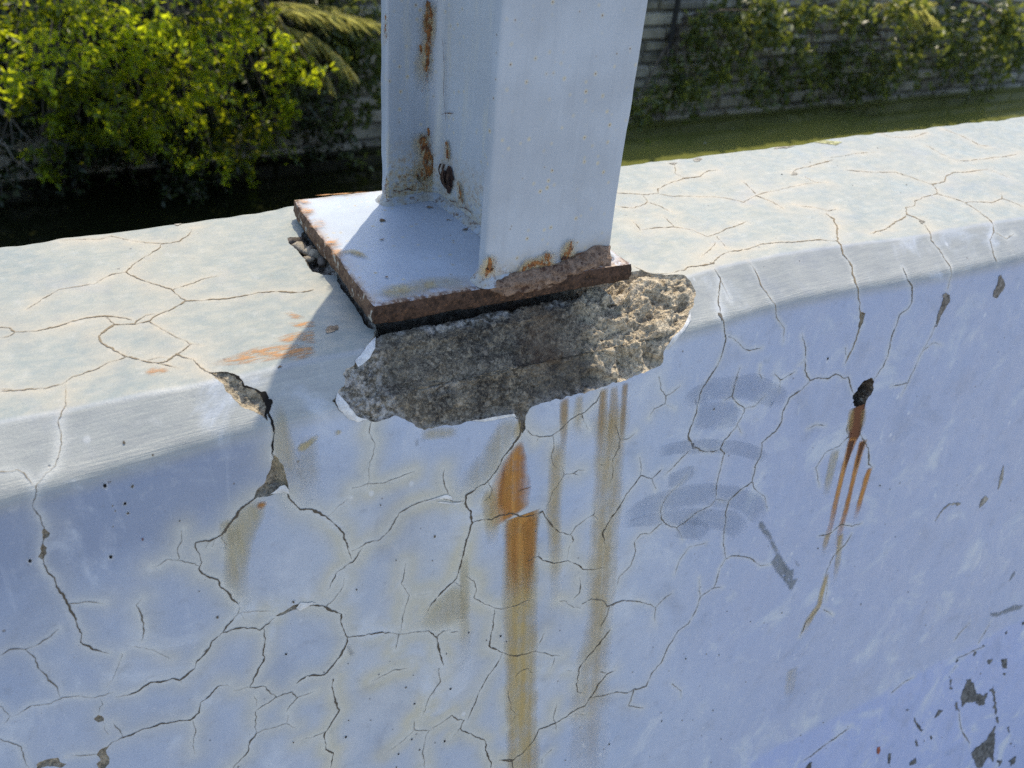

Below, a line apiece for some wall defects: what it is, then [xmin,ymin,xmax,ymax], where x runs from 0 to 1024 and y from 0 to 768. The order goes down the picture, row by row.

corrosion [419,1,434,92]
corrosion [416,128,463,204]
crack [703,131,1021,287]
spalling [209,372,273,420]
spalling [254,454,289,498]
crack [0,168,862,768]
spalling [332,245,696,434]
crack [812,421,872,482]
corrosion [828,404,871,523]
crack [877,268,936,390]
corrosion [498,446,534,767]
peeling [948,677,1016,768]